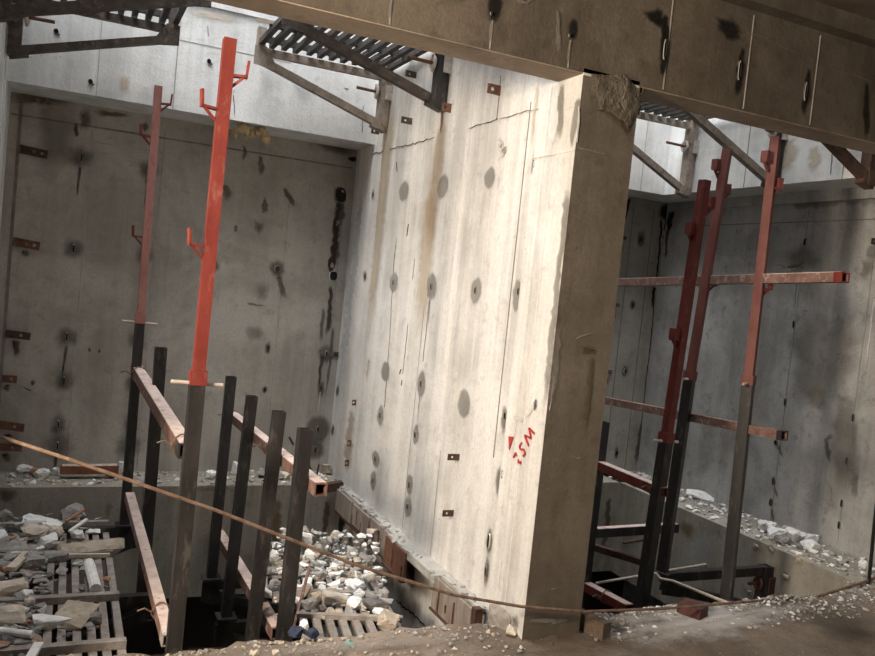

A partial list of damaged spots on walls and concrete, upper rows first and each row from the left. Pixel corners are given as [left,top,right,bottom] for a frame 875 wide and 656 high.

damp [646,10,669,74]
crack [471,75,537,128]
crack [370,137,434,169]